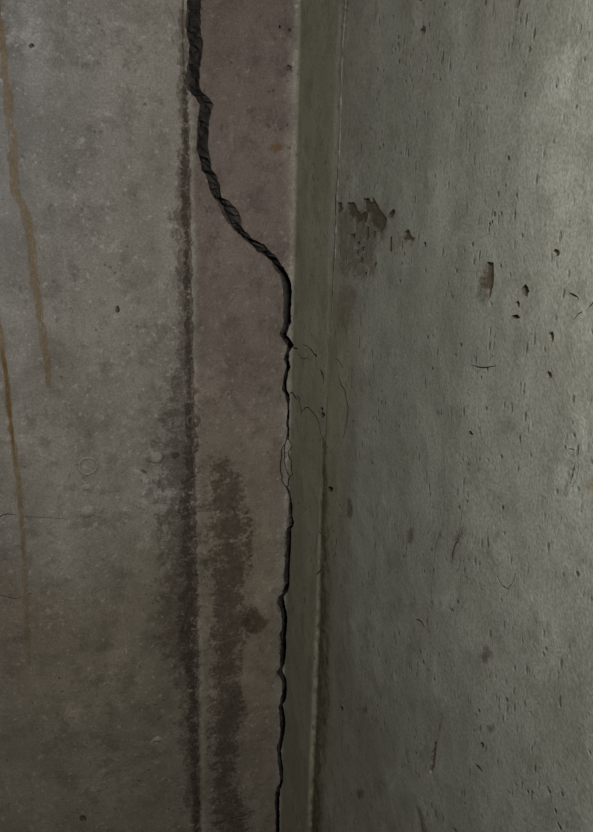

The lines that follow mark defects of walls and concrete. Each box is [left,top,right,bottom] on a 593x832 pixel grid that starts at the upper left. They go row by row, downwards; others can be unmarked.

rust [0,4,50,386]
spalling [337,198,395,263]
spalling [478,262,494,302]
rust [0,324,25,557]
crack [185,0,349,832]